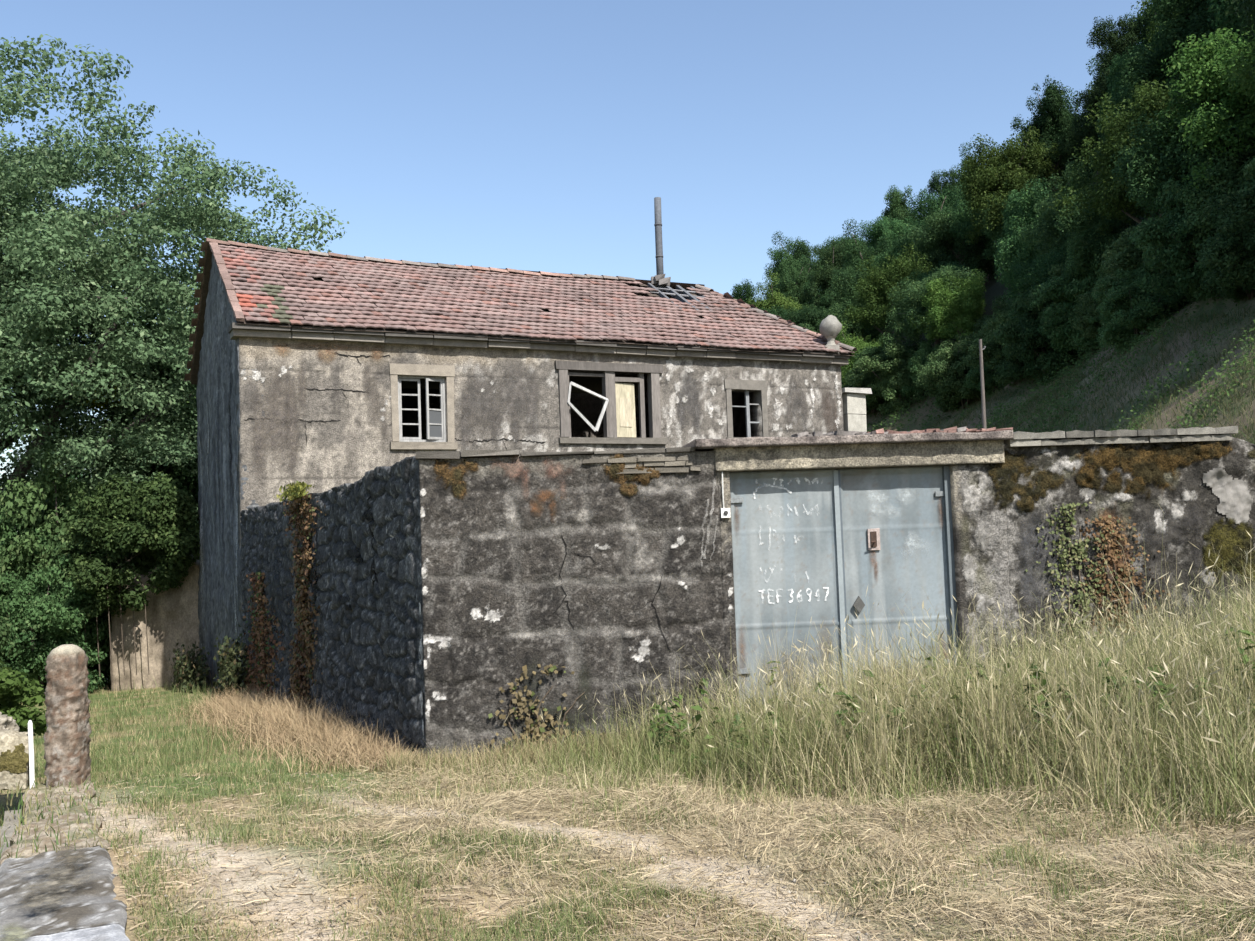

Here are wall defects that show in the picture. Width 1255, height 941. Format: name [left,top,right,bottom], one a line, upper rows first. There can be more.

peeling [471,606,501,622]
crack [554,533,599,630]
peeling [630,639,651,662]
crack [640,576,670,651]